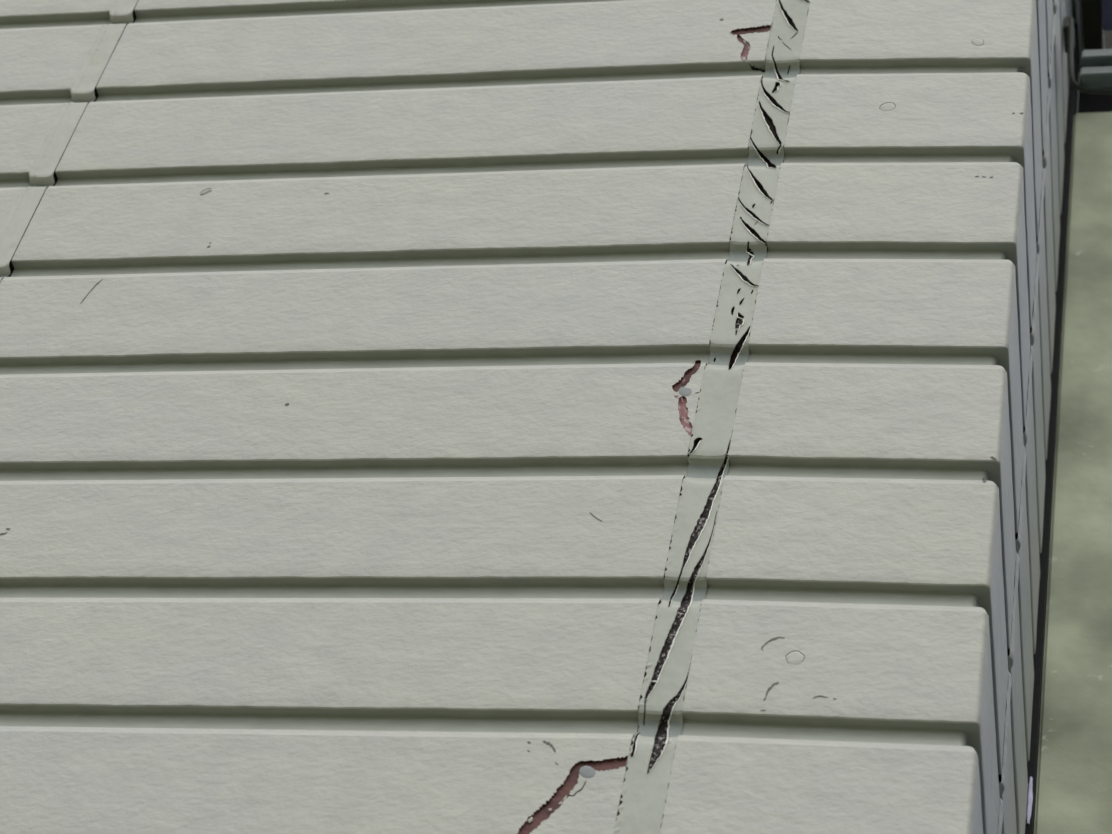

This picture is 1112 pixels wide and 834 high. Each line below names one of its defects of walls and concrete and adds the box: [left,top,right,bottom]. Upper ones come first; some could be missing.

crack [517,0,810,834]